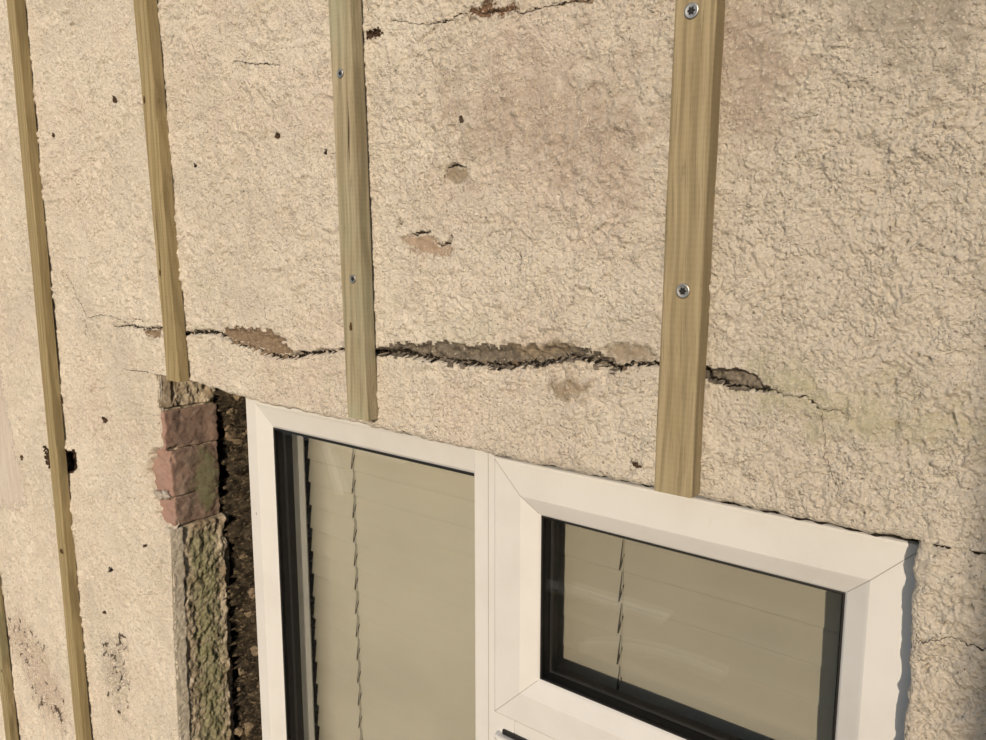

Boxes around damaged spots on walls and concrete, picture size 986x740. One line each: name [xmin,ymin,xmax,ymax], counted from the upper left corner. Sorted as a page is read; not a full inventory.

crack [393,0,590,25]
peeling [402,230,453,259]
crack [63,272,345,360]
crack [375,339,660,374]
crack [705,365,847,501]
crack [935,544,986,555]
crack [915,637,984,651]